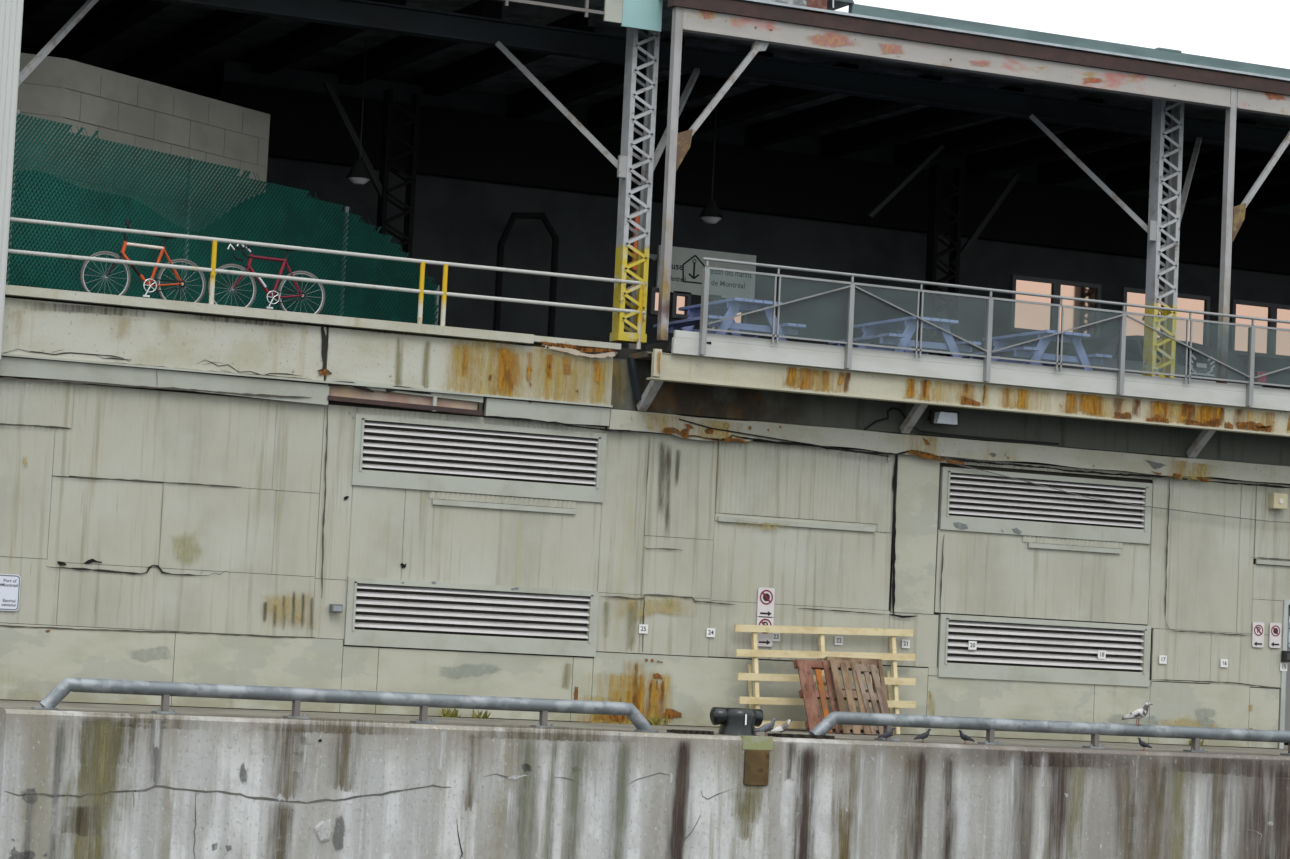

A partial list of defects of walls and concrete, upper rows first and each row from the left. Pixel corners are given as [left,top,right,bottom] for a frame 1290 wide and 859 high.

rust [803,0,827,14]
rust [327,395,483,416]
rust [455,341,614,403]
rust [656,415,781,443]
rust [1066,393,1271,432]
crack [5,772,448,859]
damp [274,718,373,859]
damp [507,726,601,859]
damp [611,747,628,859]
damp [904,755,925,859]
damp [944,761,953,859]
damp [1118,758,1251,859]